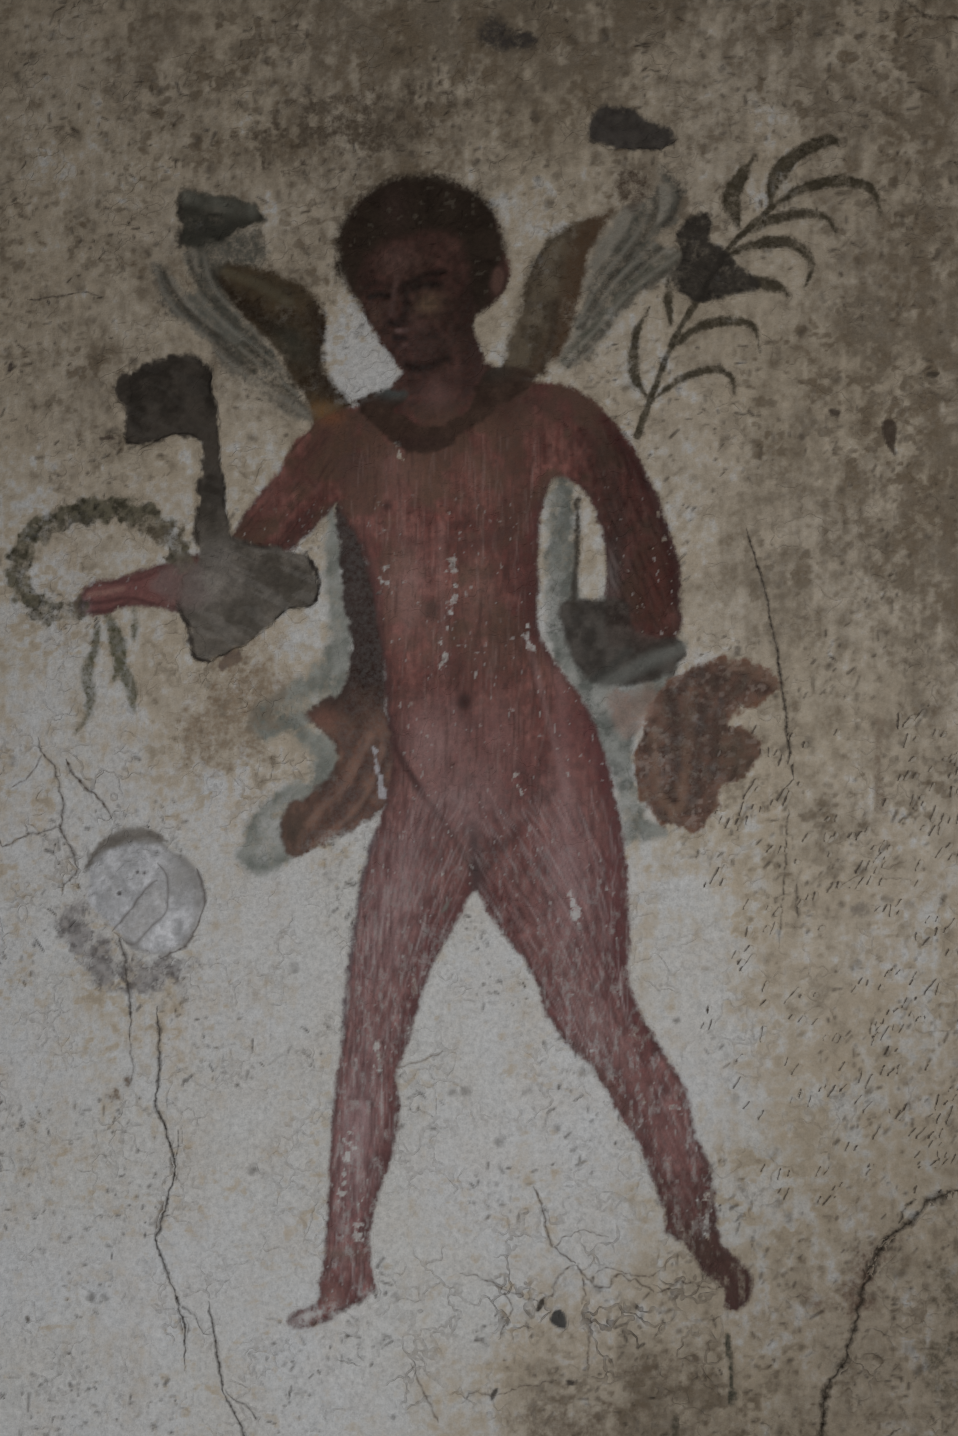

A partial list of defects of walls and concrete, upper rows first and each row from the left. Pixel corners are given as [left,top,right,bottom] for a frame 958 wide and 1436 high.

peeling [172,184,269,251]
peeling [585,101,679,154]
crack [898,0,958,22]
flaking render [96,349,324,665]
crack [112,862,258,1436]
crack [816,1187,958,1436]